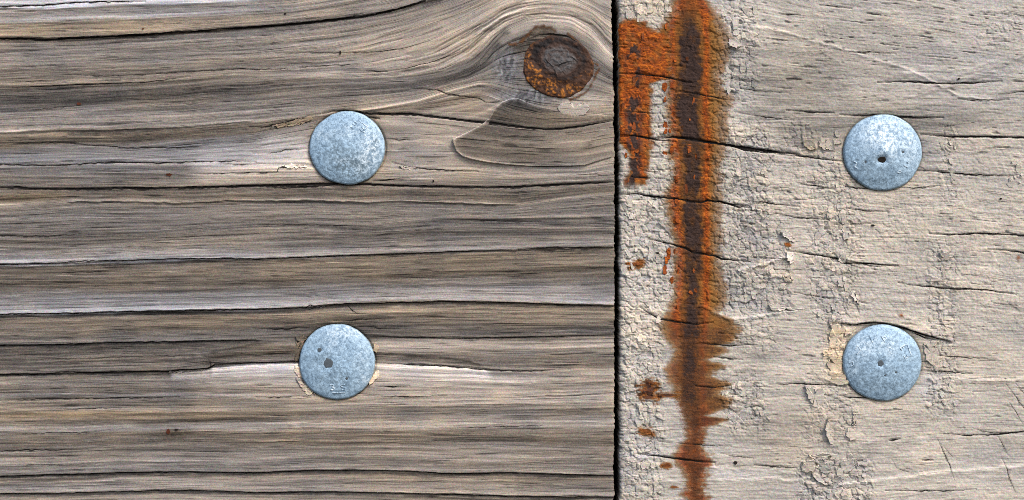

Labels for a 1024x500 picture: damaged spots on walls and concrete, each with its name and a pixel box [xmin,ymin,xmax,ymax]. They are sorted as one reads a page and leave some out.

crack [0,43,885,224]
crack [635,73,1024,138]
crack [0,340,613,498]
corrosion [618,0,741,500]
peeling [801,179,871,500]
crack [838,322,980,373]